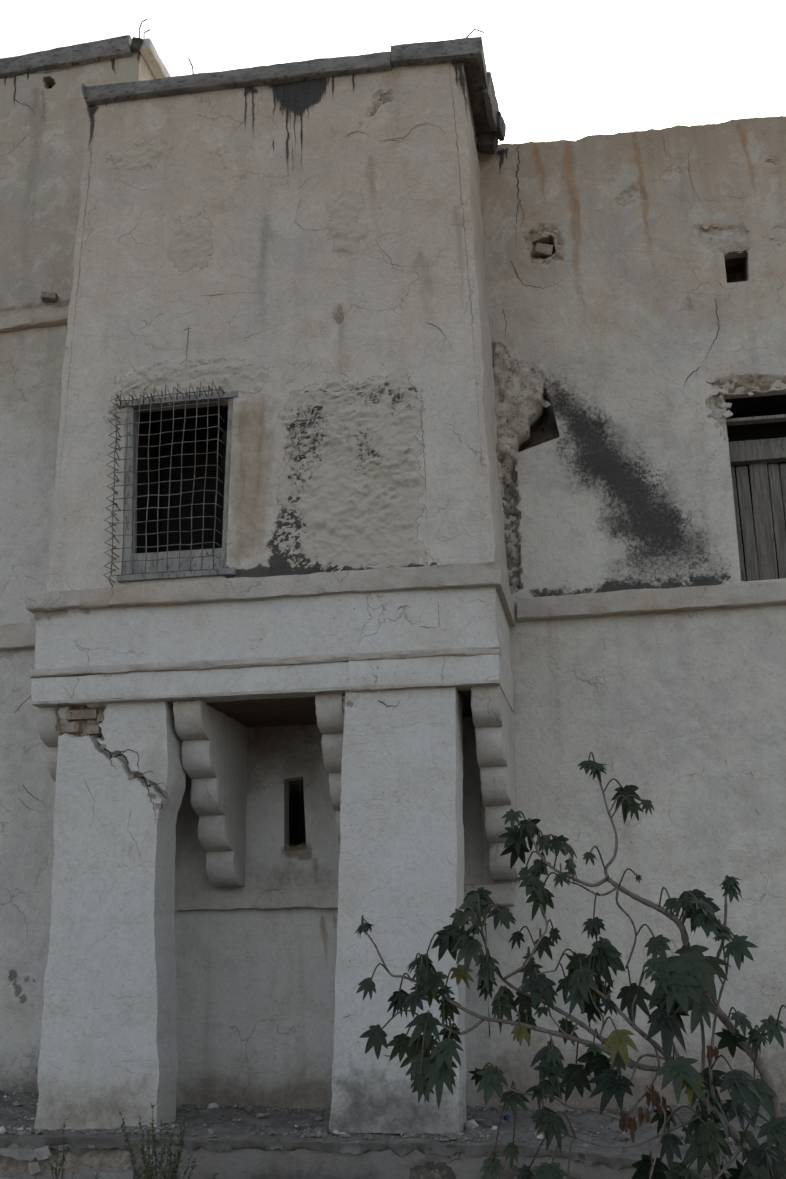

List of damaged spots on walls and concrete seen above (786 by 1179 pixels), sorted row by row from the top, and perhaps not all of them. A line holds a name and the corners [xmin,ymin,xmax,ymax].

leakage [244,76,334,164]
crack [511,139,558,289]
spalling [704,375,786,440]
spalling [493,341,551,593]
leakage [530,574,731,597]
crack [98,742,170,859]